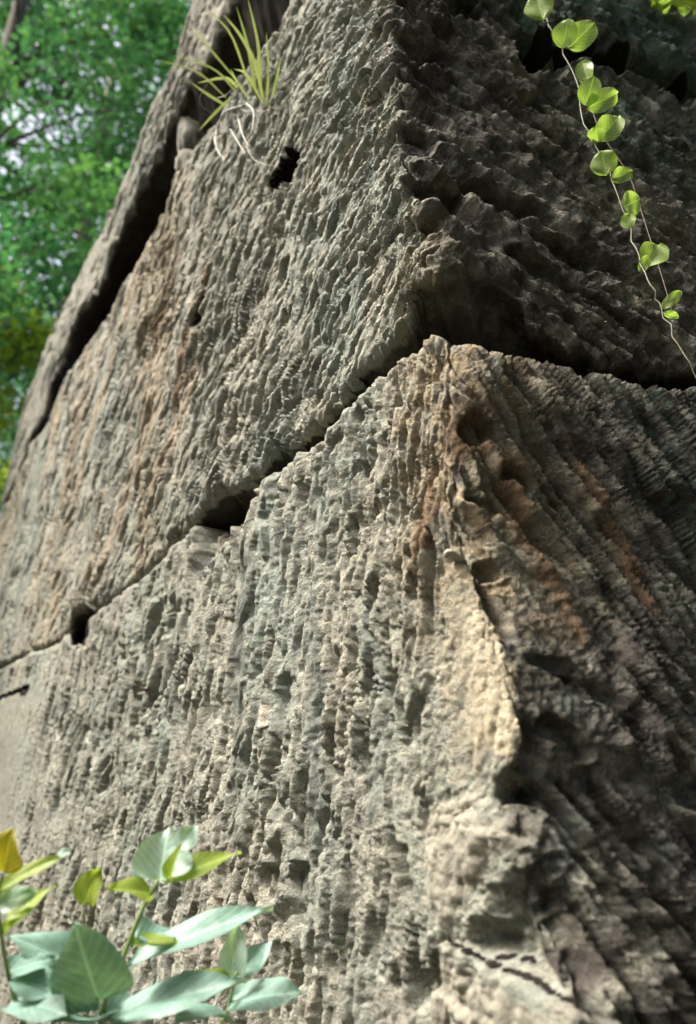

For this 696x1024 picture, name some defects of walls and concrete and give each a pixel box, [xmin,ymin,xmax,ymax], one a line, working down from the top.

crack [173,266,210,403]
crack [446,938,594,1019]